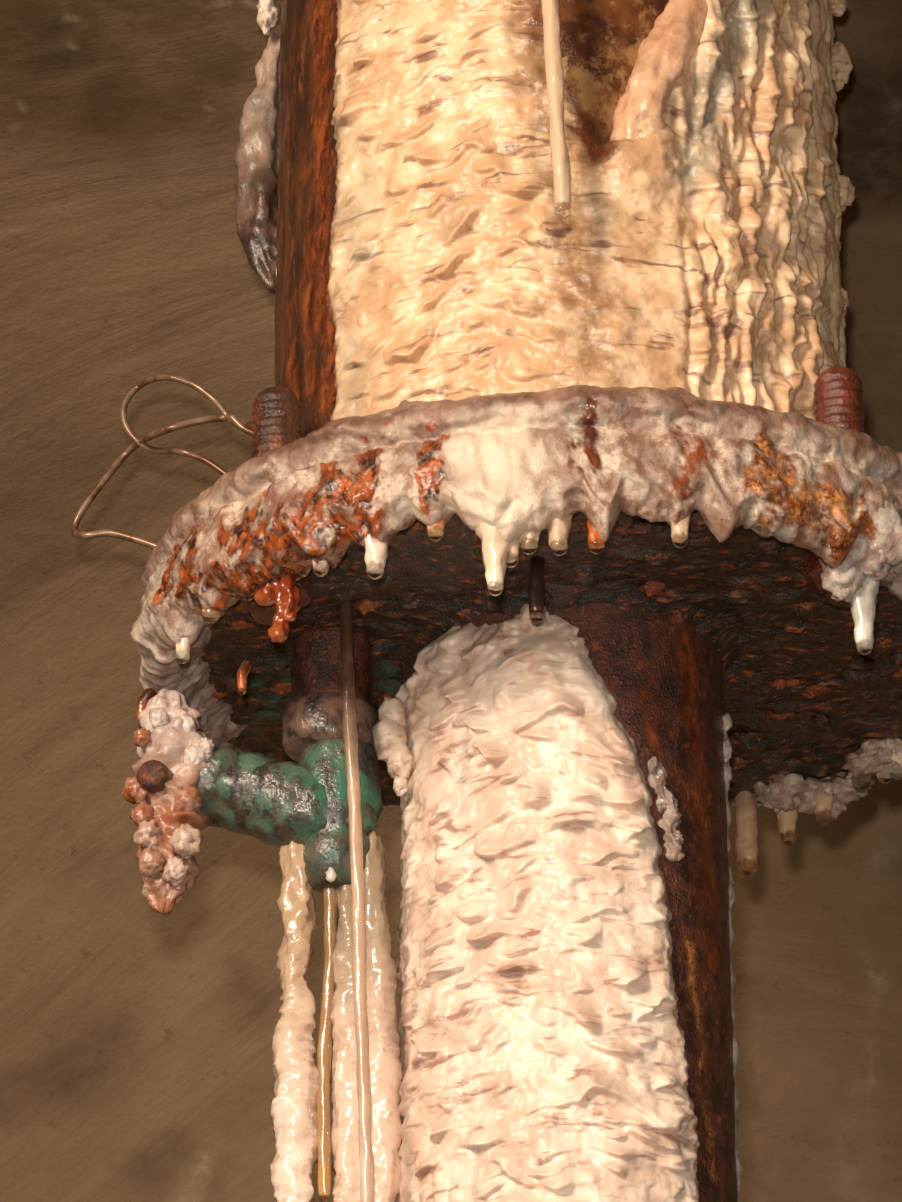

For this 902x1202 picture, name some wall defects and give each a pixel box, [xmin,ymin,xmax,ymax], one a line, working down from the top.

corrosion [286,0,337,412]
corrosion [153,423,396,614]
corrosion [414,423,449,514]
damp [122,0,902,915]
corrosion [568,393,601,472]
corrosion [673,425,708,525]
corrosion [742,423,881,568]
corrosion [677,632,716,918]
damp [372,555,700,1202]
corrosion [686,933,720,1012]
damp [722,712,902,1199]